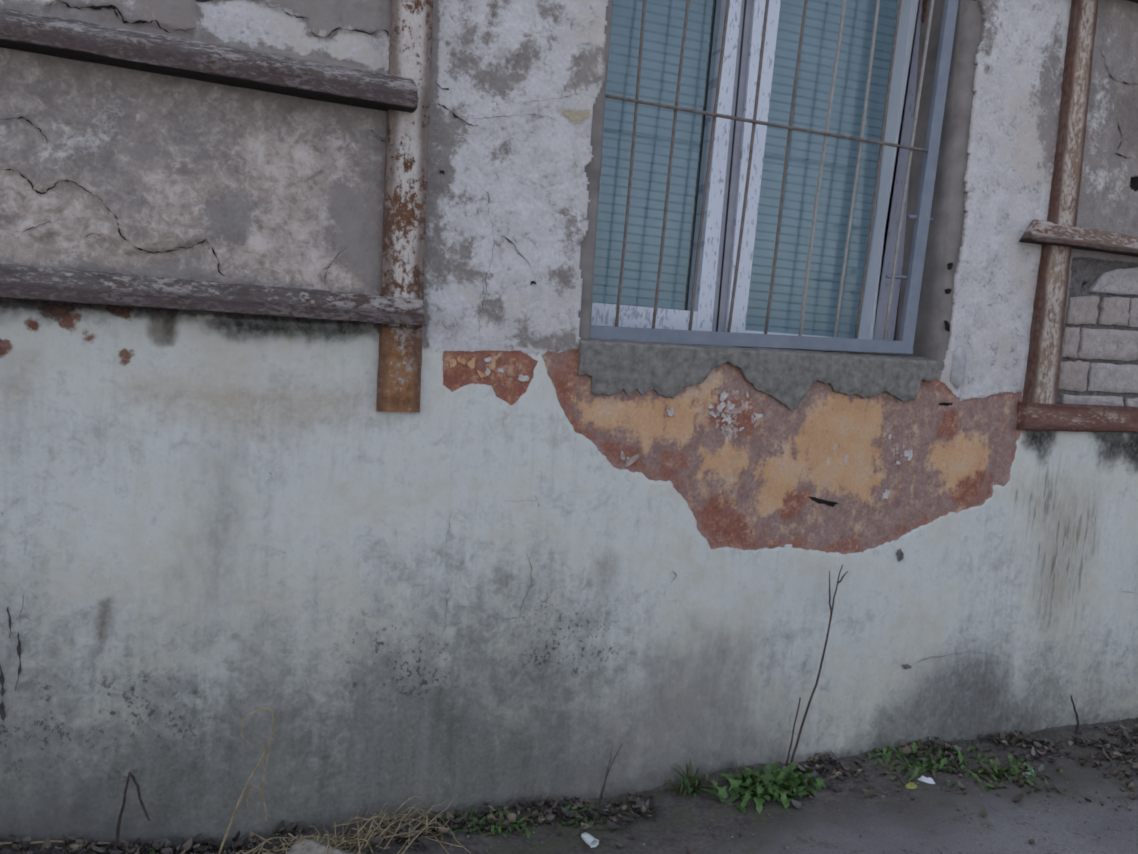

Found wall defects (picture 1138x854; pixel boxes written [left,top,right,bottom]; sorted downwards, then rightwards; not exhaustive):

crack [48,0,213,33]
crack [260,0,388,38]
crack [5,169,230,277]
corrosion [0,339,12,356]
corrosion [25,306,81,330]
corrosion [106,307,130,318]
corrosion [119,349,131,364]
flaking render [1057,257,1138,407]
peeling [443,349,1023,562]